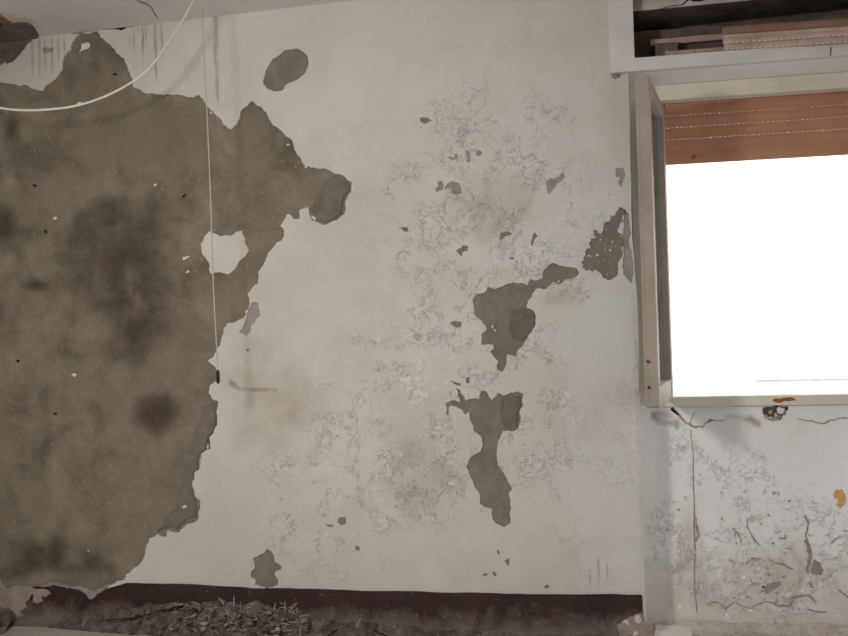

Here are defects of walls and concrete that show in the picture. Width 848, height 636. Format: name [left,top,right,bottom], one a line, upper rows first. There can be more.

crack [637,0,704,14]
flaking render [0,14,355,618]
flaking render [473,207,634,371]
flaking render [446,377,523,527]
crack [671,407,827,613]
crack [798,416,848,424]